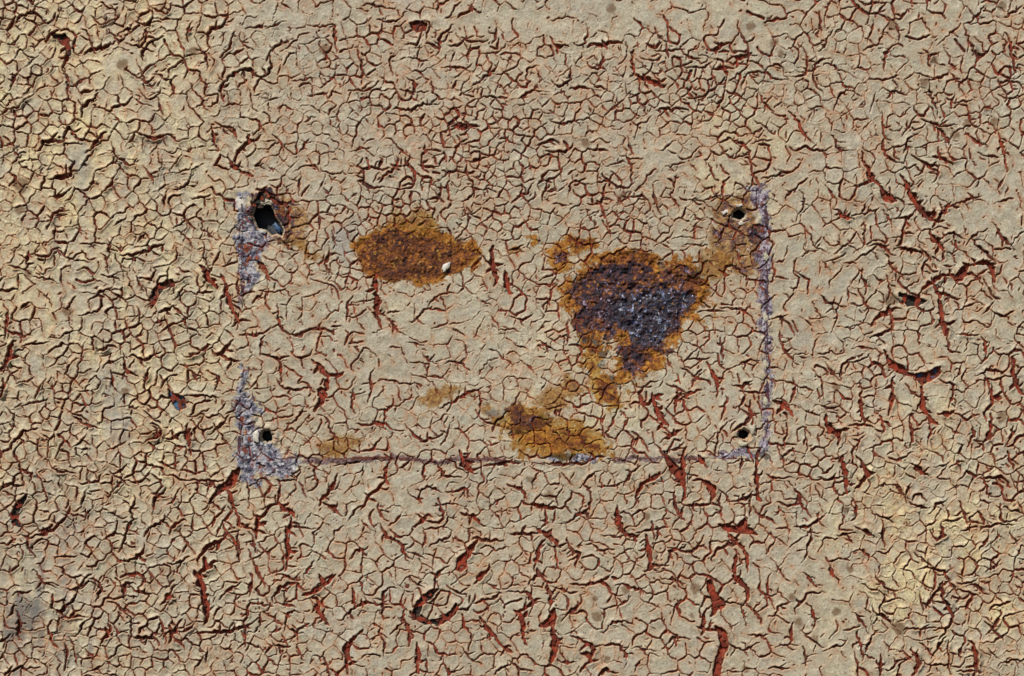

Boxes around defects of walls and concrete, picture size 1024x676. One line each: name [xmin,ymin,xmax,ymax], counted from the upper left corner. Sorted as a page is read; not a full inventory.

crack [207,17,286,109]
crack [313,24,499,131]
crack [520,22,851,117]
crack [0,2,173,385]
crack [299,138,495,197]
corrosion [349,207,483,289]
crack [537,118,581,190]
crack [727,111,826,189]
crack [833,73,1014,353]
corrosion [482,192,762,463]
crack [123,244,1024,676]
crack [0,394,395,676]